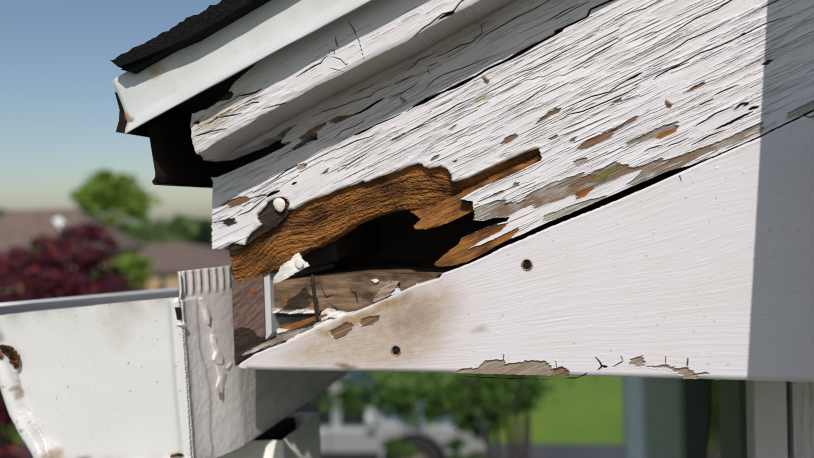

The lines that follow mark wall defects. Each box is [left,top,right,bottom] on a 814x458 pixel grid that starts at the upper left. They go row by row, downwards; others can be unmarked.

crack [564,0,790,117]
crack [319,0,660,167]
crack [197,89,285,136]
crack [647,85,752,150]
peeling [221,194,266,208]
peeling [434,116,763,267]
peeling [272,253,310,283]
peeling [330,315,380,340]
corrosion [0,345,20,370]
peeling [453,359,570,376]
peeling [629,356,709,379]